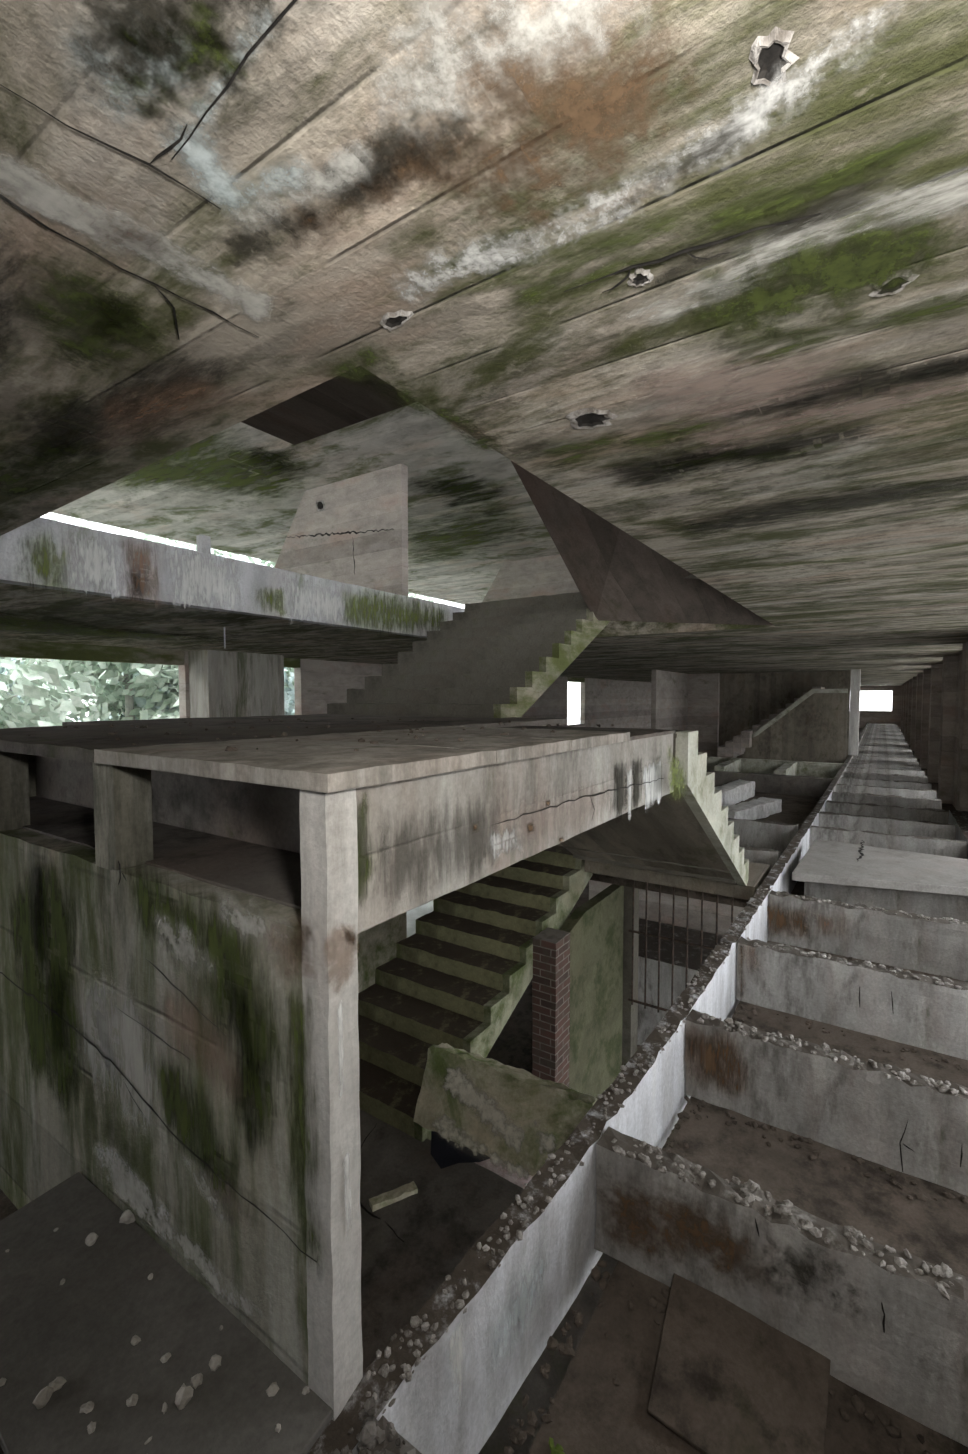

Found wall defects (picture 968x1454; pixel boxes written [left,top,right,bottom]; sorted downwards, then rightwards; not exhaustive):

water stain [75,0,283,116]
spalling [749,26,800,87]
crack [0,0,297,210]
water stain [654,53,828,185]
water stain [655,128,968,318]
spalling [868,270,919,297]
spalling [564,407,619,430]
water stain [543,355,968,486]
rust [127,545,157,604]
crack [492,778,664,825]
water stain [614,760,661,818]
crack [856,840,864,861]